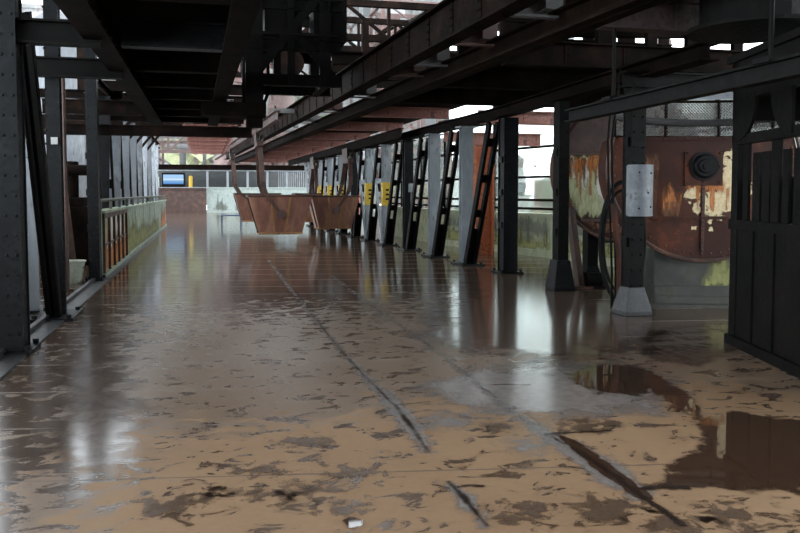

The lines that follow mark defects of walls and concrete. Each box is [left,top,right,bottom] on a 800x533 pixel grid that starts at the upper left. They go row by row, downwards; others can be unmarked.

corrosion [569,155,599,195]
peeling [569,155,604,218]
corrosion [646,157,679,216]
peeling [684,149,732,231]
corrosion [688,184,729,211]
crack [268,260,434,452]
crack [334,277,691,528]
water stain [554,416,621,435]